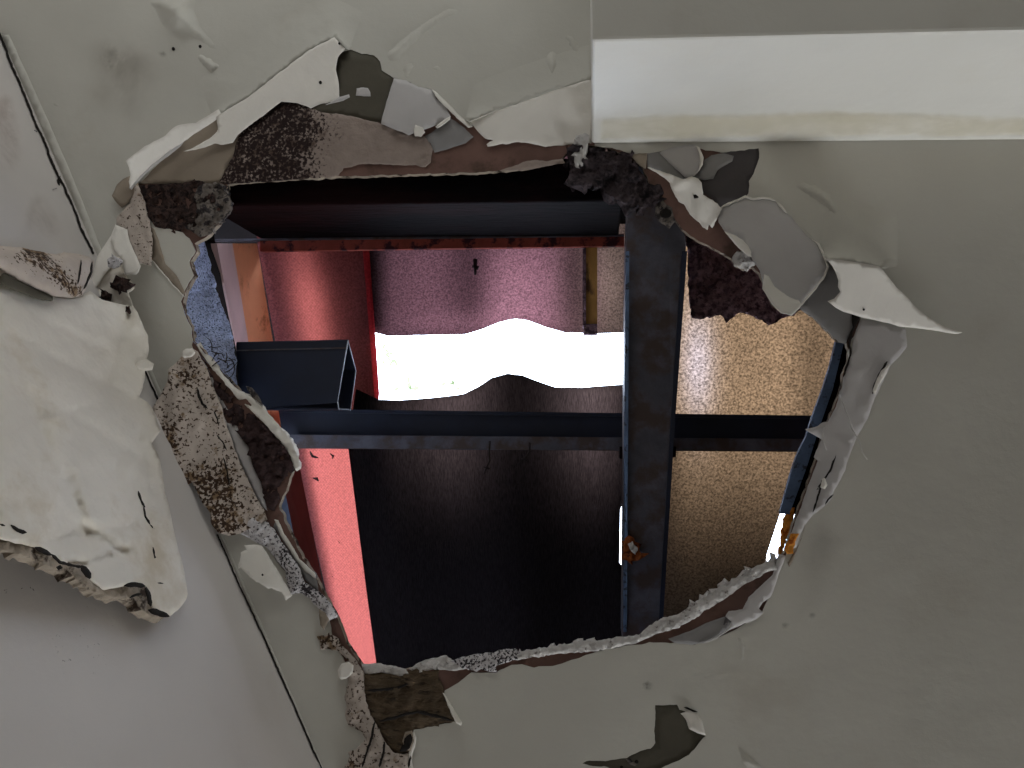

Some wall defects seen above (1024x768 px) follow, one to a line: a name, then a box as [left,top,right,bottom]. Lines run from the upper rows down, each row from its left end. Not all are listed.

peeling [92,225,141,302]
flaking render [112,37,962,660]
rust [621,535,650,565]
rust [778,507,799,555]
spalling [338,655,464,679]
peeling [443,693,462,725]
peeling [402,731,416,768]
peeling [584,705,705,768]